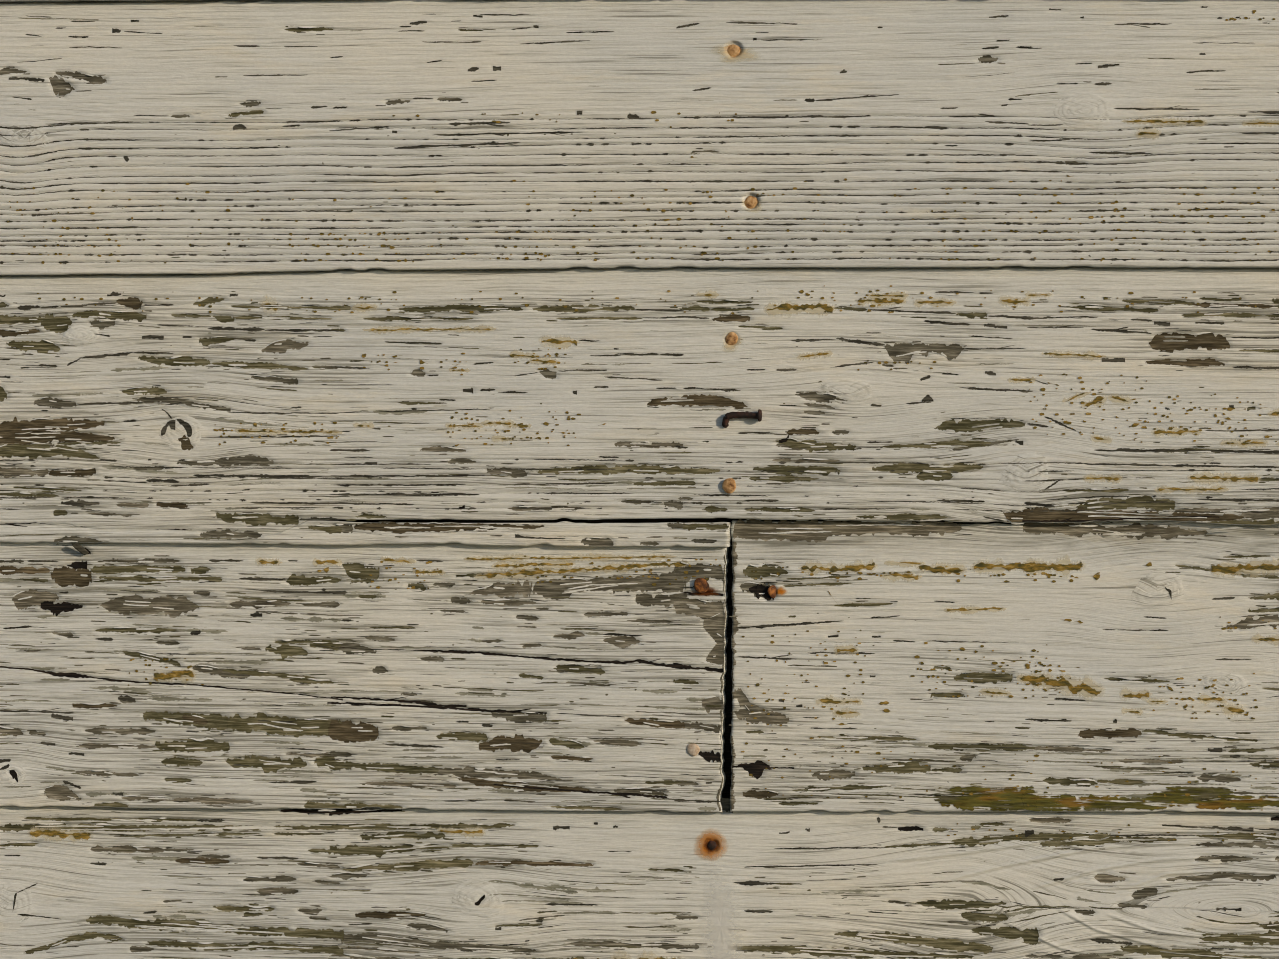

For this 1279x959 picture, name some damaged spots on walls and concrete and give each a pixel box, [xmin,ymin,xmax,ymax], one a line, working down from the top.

crack [0,64,1279,372]
peeling [1072,298,1279,368]
crack [0,291,1279,570]
peeling [0,558,222,634]
crack [331,584,875,673]
peeling [469,551,789,746]
crack [0,708,84,789]
peeling [80,711,642,811]
crack [698,750,794,779]
peeling [0,795,594,959]
rust [698,833,723,858]
peeling [729,899,1039,959]